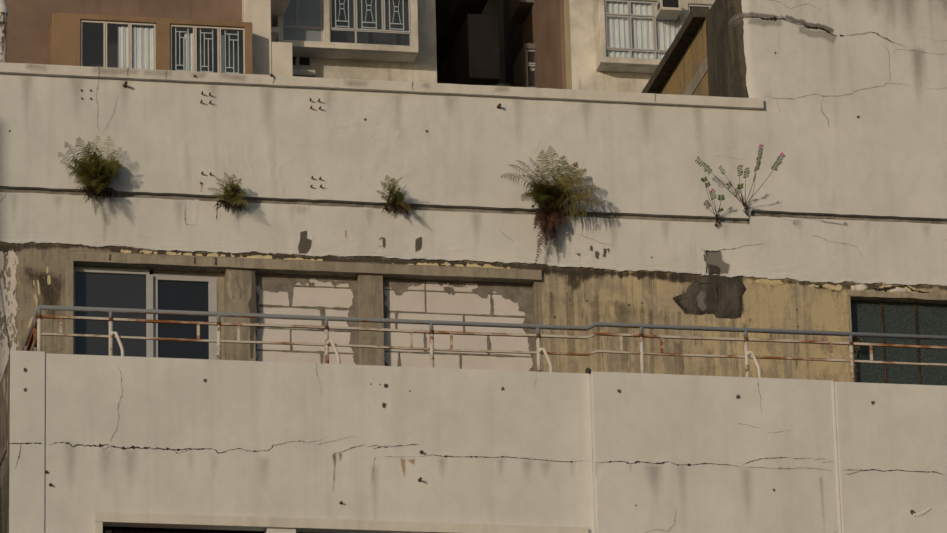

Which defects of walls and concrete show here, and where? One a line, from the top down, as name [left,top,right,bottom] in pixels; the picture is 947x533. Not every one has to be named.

crack [728,0,946,126]
peeling [0,249,51,404]
crack [0,367,944,480]